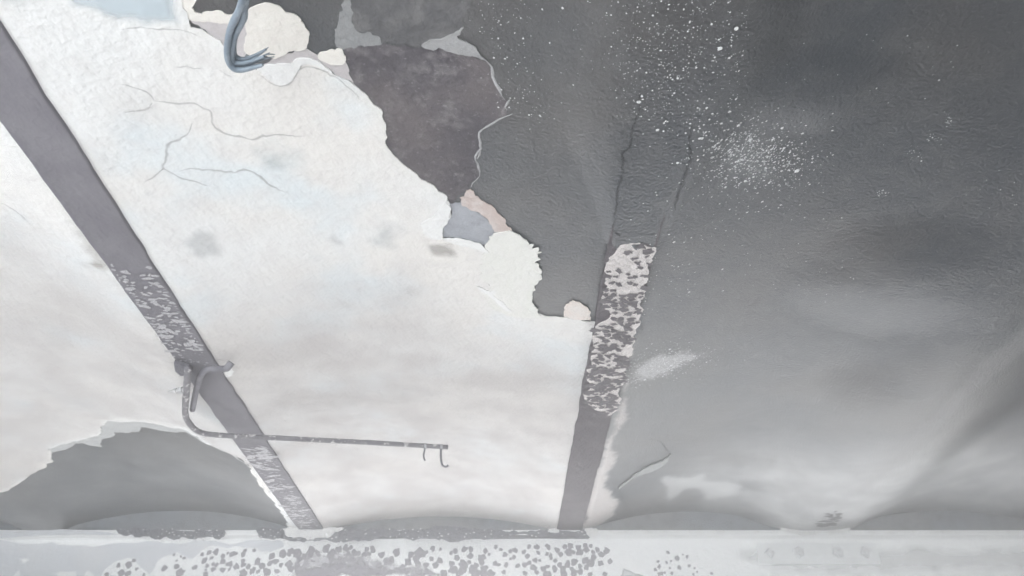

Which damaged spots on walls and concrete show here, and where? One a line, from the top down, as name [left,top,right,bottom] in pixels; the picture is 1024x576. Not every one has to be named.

peeling [0,0,820,534]
crack [612,92,641,236]
water stain [625,317,723,388]
water stain [605,0,840,219]